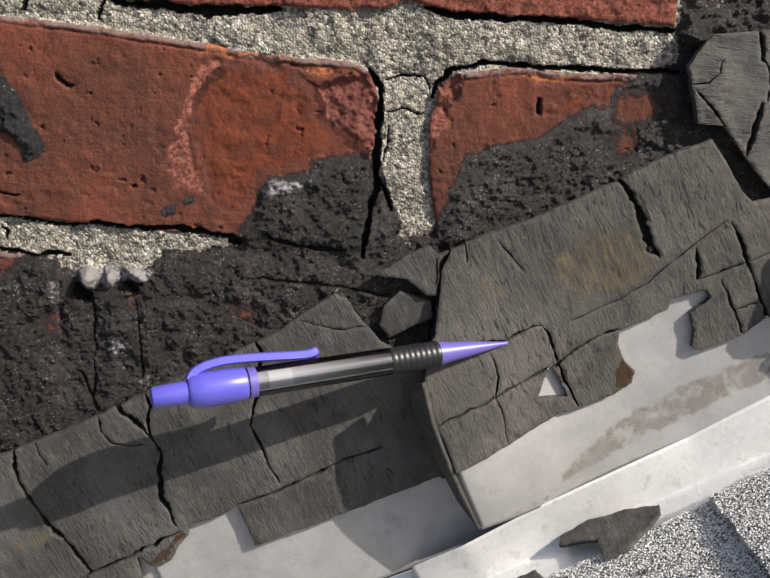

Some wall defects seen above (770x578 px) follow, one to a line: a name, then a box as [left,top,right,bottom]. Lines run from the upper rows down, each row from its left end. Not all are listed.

crack [262,59,716,259]
spalling [72,281,93,301]
crack [0,214,242,259]
spalling [121,281,140,294]
peeling [379,244,438,337]
crack [430,242,467,342]
crack [722,225,767,333]
crack [449,330,523,439]
crack [527,325,612,405]
rust [616,359,634,388]
crack [13,290,174,573]
rust [150,533,185,564]